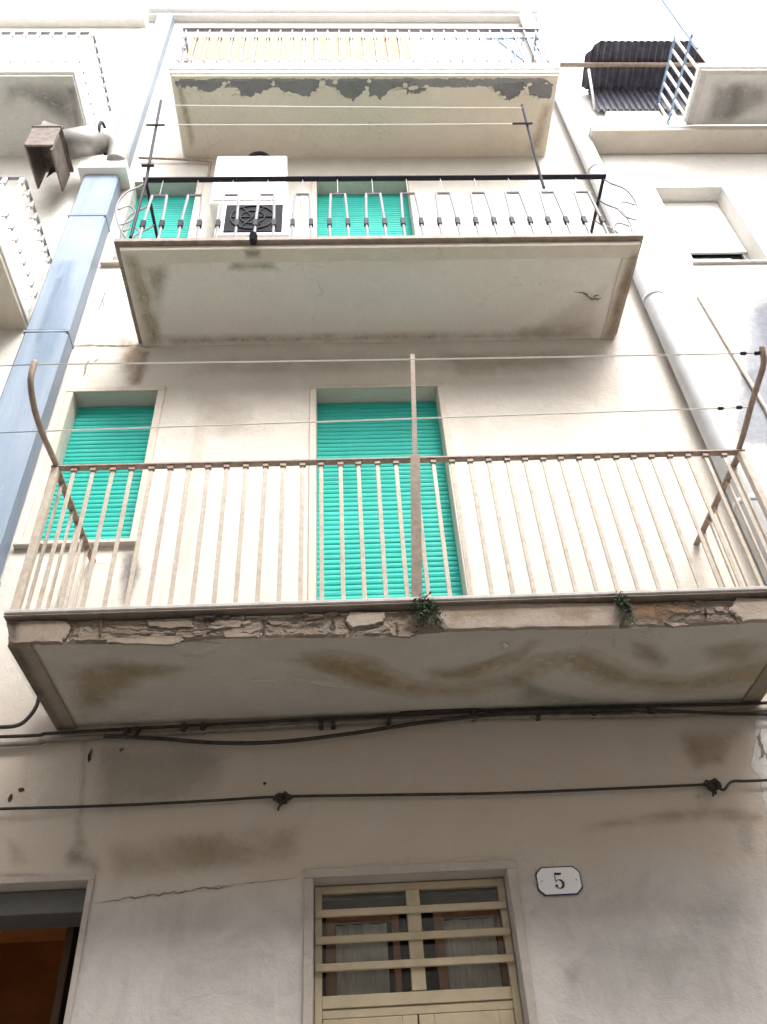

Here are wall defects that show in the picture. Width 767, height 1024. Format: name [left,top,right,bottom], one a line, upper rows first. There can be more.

peeling [175,79,429,102]
crack [574,291,601,300]
spalling [619,600,740,629]
spalling [67,611,447,646]
crack [99,877,296,903]